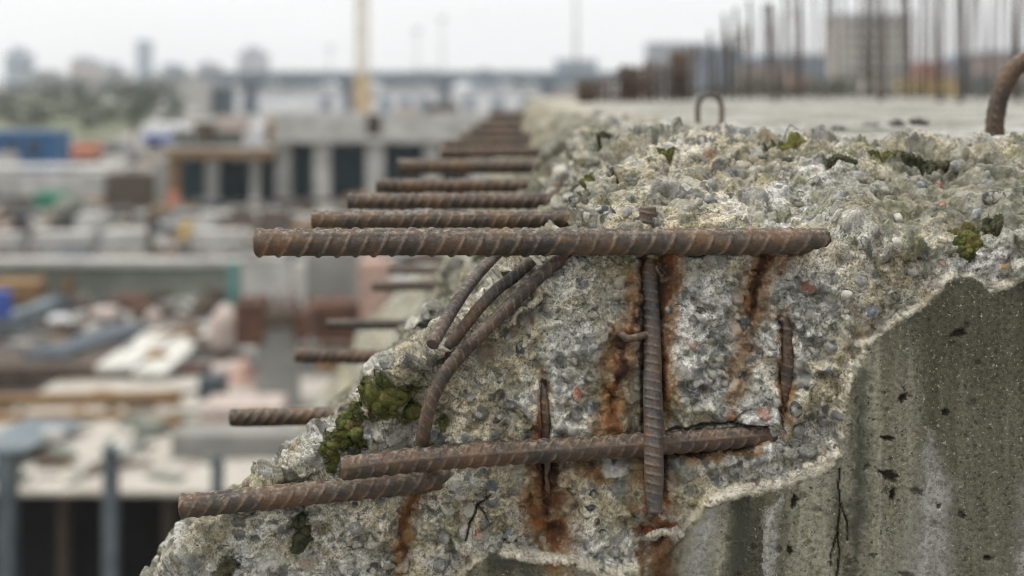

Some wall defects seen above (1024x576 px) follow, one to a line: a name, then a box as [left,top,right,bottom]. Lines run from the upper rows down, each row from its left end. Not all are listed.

rust [178,110,831,576]
spalling [140,96,1024,576]
crack [830,468,848,575]